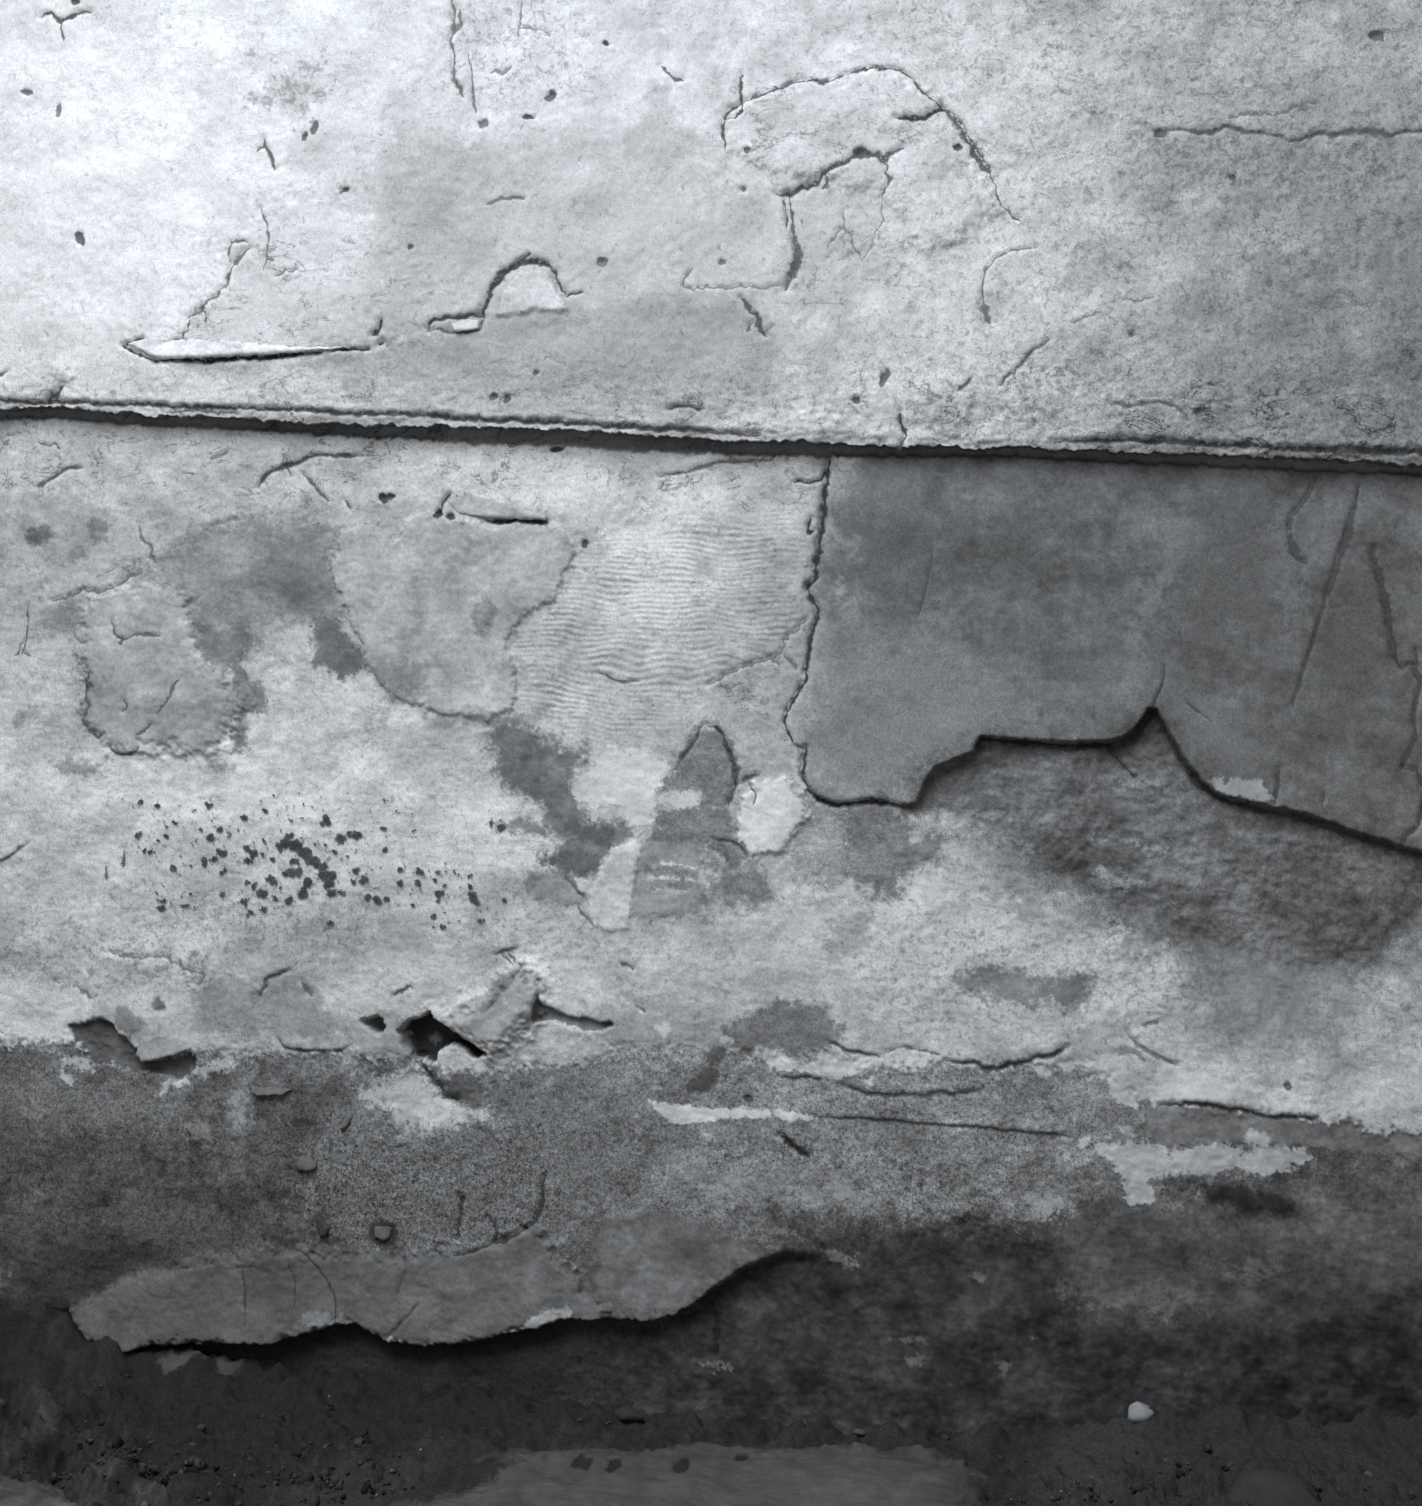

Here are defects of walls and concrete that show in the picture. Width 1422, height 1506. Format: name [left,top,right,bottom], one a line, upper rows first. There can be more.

crack [682,65,1037,337]
crack [1152,101,1422,142]
peeling [128,337,349,359]
crack [896,412,907,450]
water stain [131,512,425,773]
water stain [119,707,702,942]
crack [0,371,903,807]
peeling [781,444,1422,990]
flaking render [347,1009,484,1108]
water stain [342,1009,623,1152]
peeling [69,1212,611,1353]
water stain [589,1048,1422,1440]